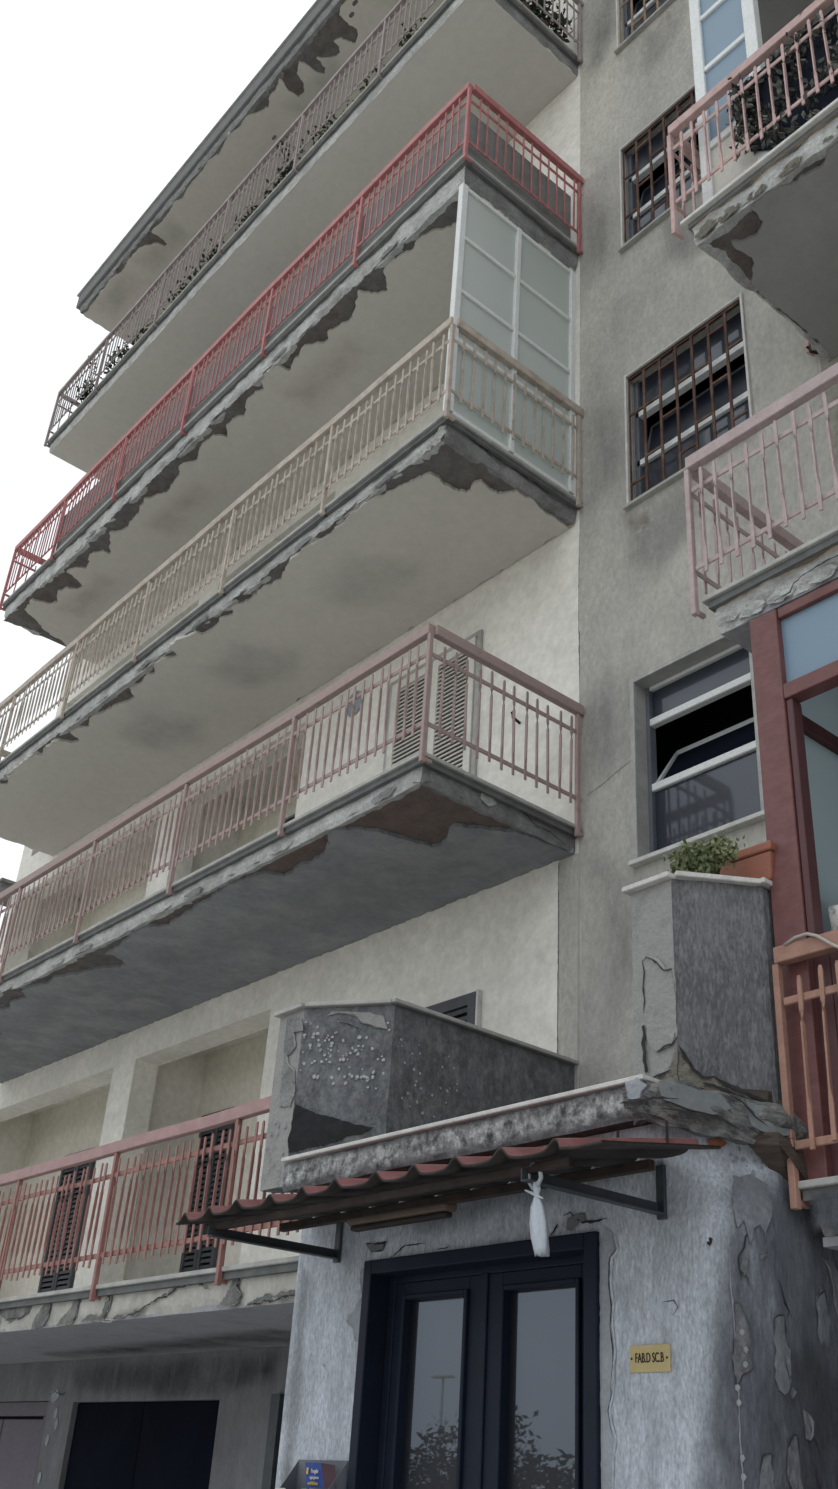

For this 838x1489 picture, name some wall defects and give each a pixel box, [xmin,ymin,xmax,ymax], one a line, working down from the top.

spalling [255,0,358,111]
spalling [694,125,838,343]
spalling [4,201,458,637]
spalling [23,424,574,760]
spalling [0,785,511,1008]
flaking render [327,1011,388,1031]
crack [641,961,782,1105]
spalling [620,1077,809,1147]
flaking render [732,1174,773,1277]
flaking render [731,1301,755,1385]
flaking render [759,1314,814,1489]
flaking render [816,1258,838,1348]